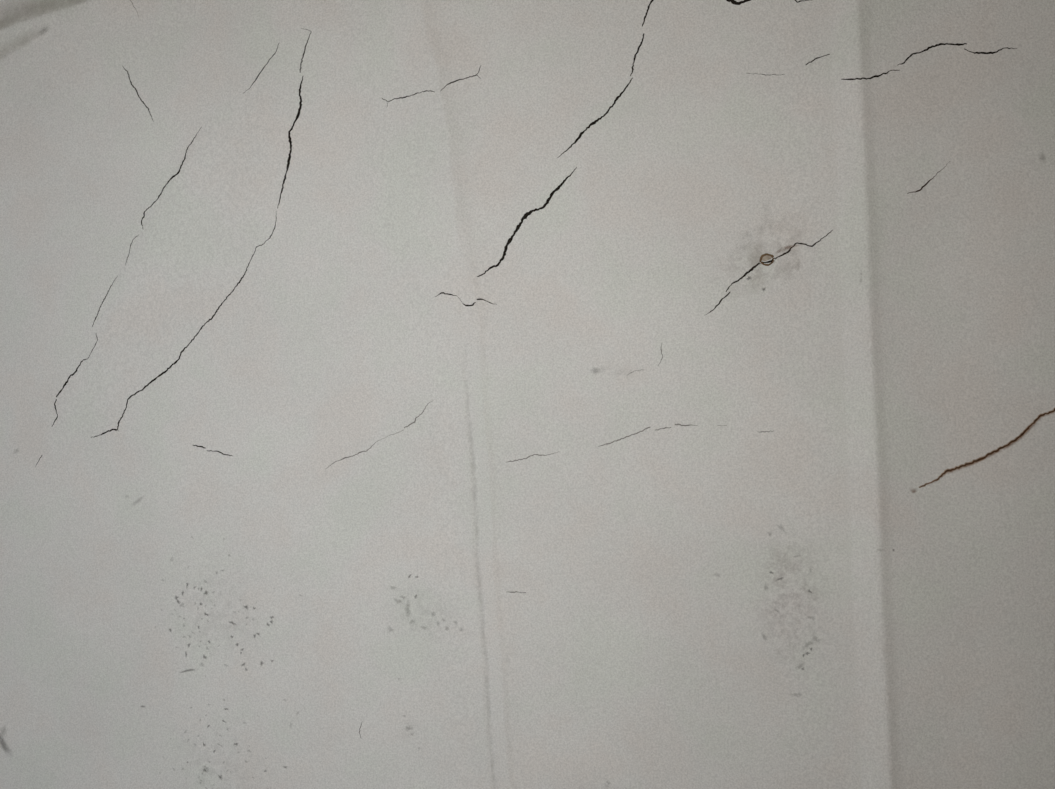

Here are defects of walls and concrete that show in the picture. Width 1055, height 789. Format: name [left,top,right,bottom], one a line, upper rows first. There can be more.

crack [725,0,763,8]
crack [381,65,482,108]
crack [746,53,830,76]
crack [841,42,1018,81]
crack [434,0,655,307]
crack [91,28,312,438]
crack [51,126,202,427]
crack [704,229,833,316]
crack [192,444,233,457]
crack [325,400,433,470]
crack [919,408,1055,488]